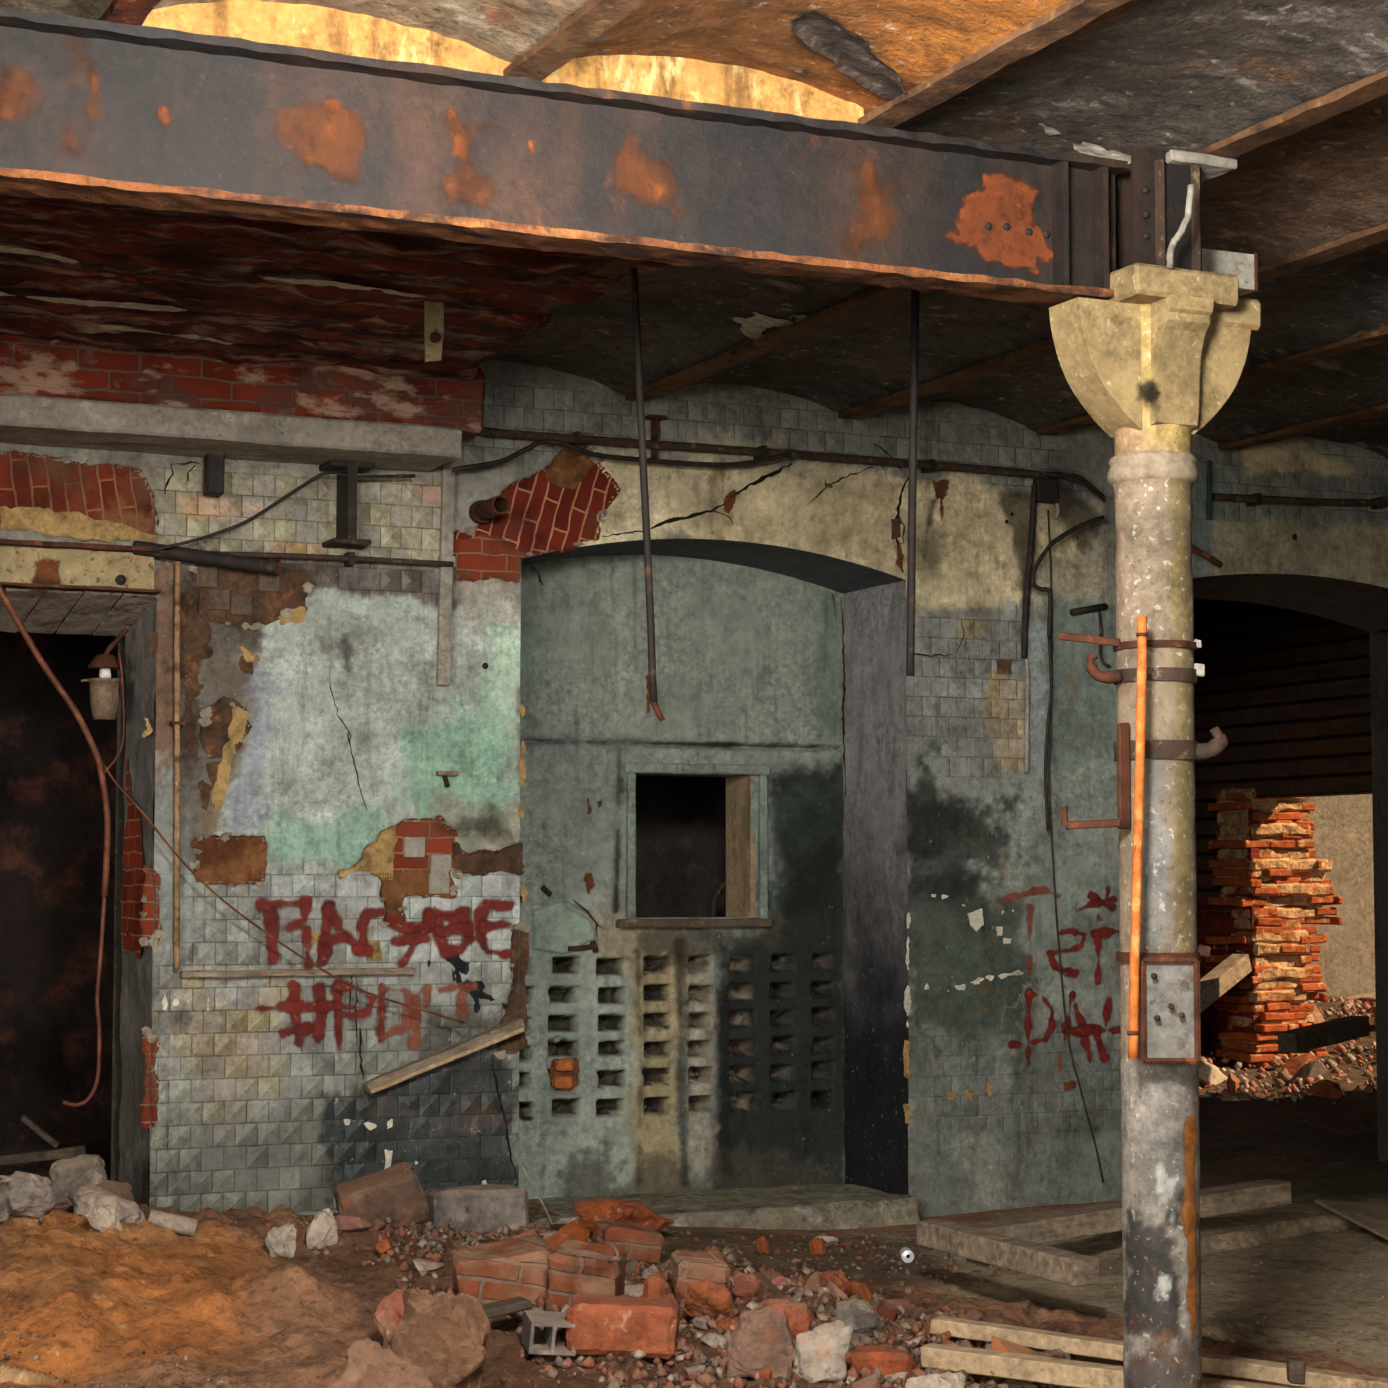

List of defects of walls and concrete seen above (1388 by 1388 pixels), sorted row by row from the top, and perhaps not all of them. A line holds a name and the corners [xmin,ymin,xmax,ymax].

spalling [0,193,671,381]
corrosion [616,147,673,202]
corrosion [946,173,1053,275]
flaking render [0,450,159,543]
flaking render [453,446,621,583]
crack [602,463,792,537]
crack [809,443,909,573]
peeling [173,565,314,813]
crack [329,672,367,810]
peeling [189,832,268,888]
flaking render [337,815,528,961]
corrosion [1181,1115,1197,1336]